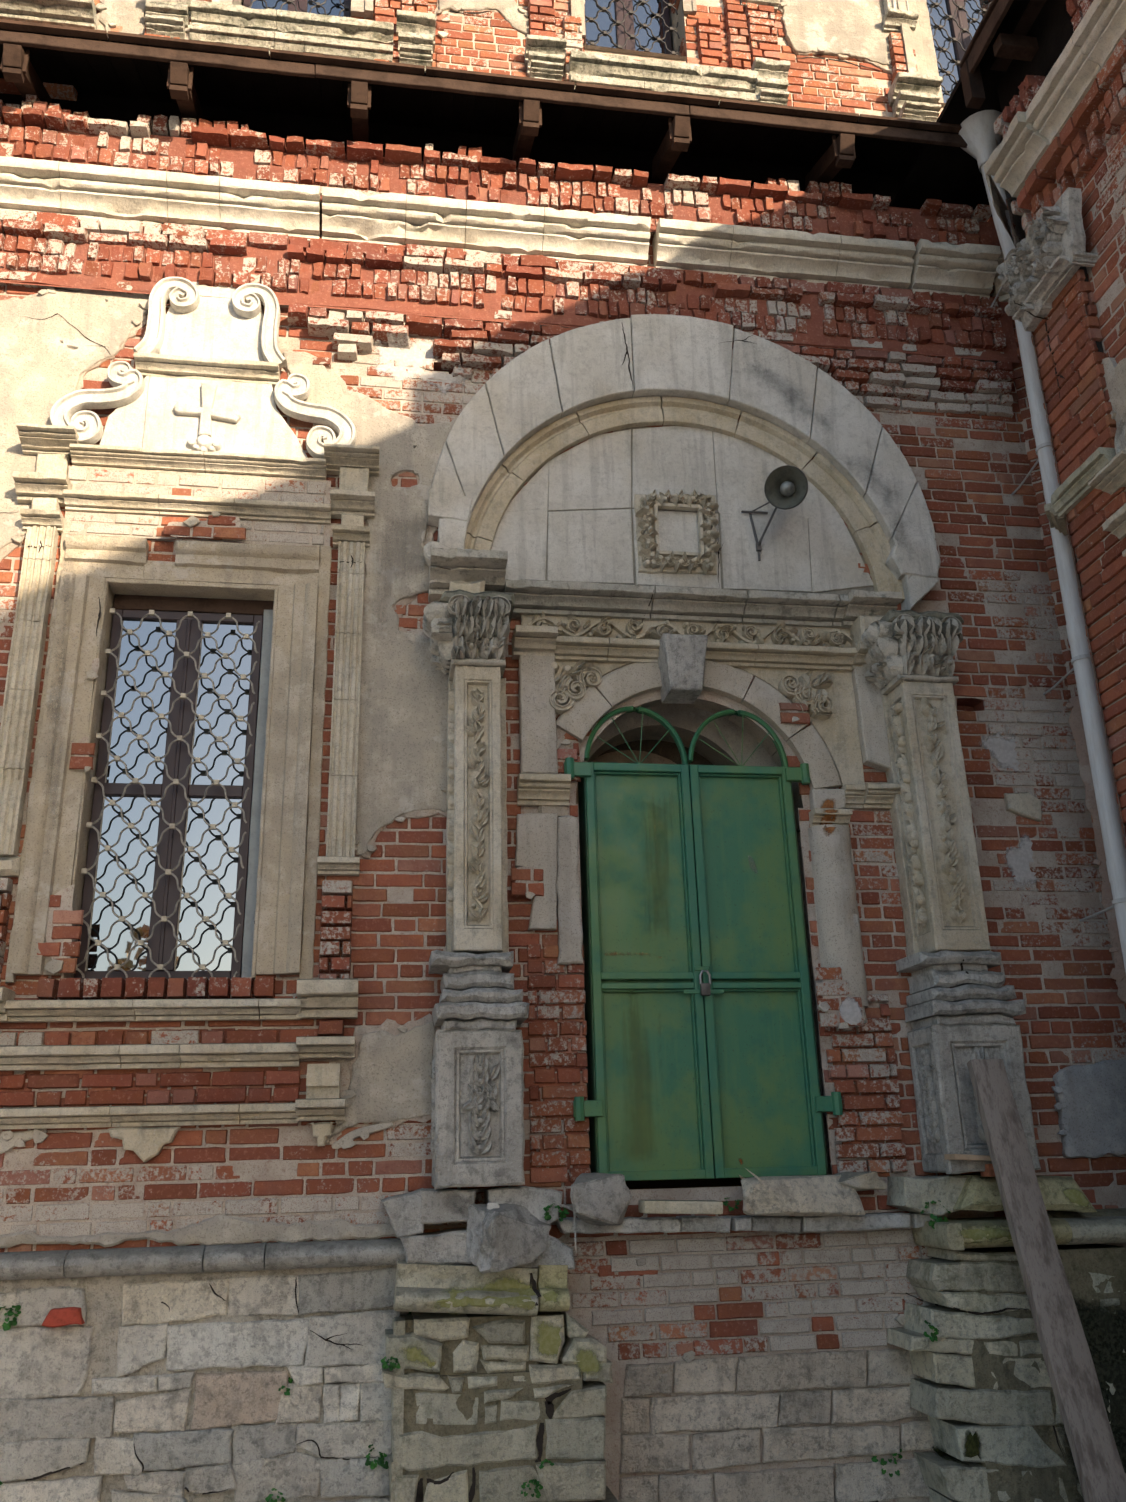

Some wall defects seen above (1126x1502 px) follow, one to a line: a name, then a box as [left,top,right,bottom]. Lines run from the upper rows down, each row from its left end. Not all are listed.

peeling [778,0,892,74]
peeling [0,286,150,562]
spalling [957,698,984,711]
peeling [325,1013,441,1149]
peeling [0,1129,48,1154]
crack [529,1273,541,1306]
mould [1074,1298,1126,1473]
mould [1059,1424,1085,1502]